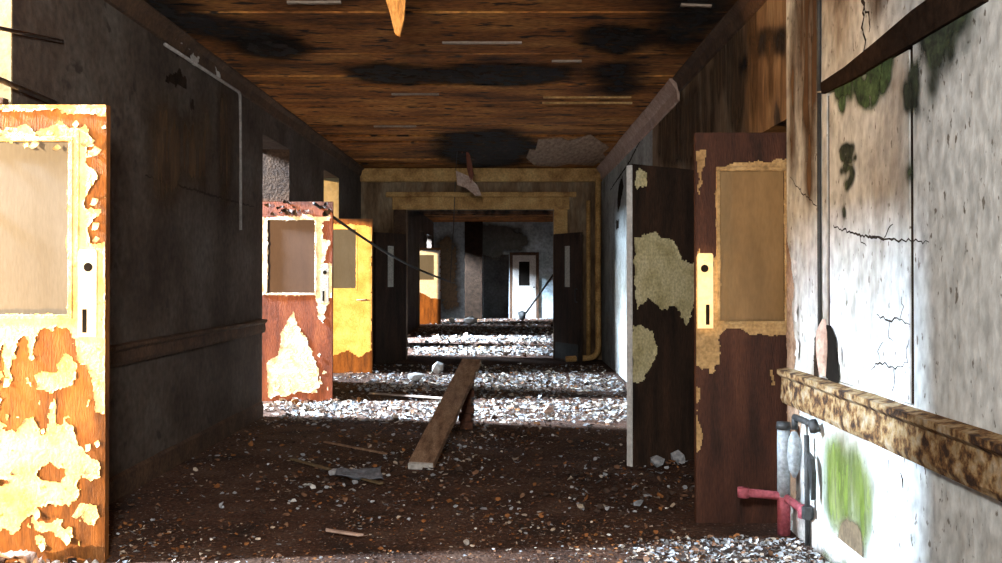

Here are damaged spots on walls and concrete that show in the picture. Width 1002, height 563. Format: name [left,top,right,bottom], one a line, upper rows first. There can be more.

crack [861,0,870,51]
water stain [834,57,893,114]
water stain [839,142,857,191]
peeling [616,168,647,230]
crack [833,224,929,245]
peeling [262,213,372,357]
peeling [633,219,799,374]
peeling [0,105,106,552]
peeling [632,325,658,383]
crack [871,297,910,391]
water stain [827,448,841,505]
water stain [838,518,863,557]